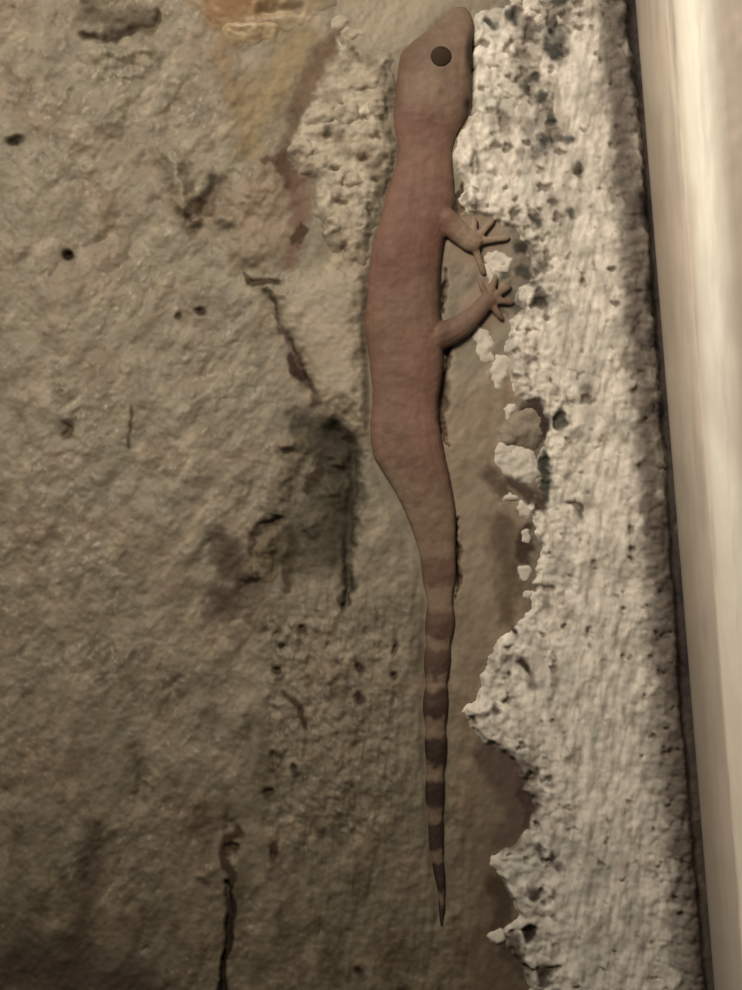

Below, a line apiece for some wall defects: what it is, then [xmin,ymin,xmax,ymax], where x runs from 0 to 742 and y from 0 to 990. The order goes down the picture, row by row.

flaking render [286,15,398,266]
crack [243,270,317,405]
damp [209,532,264,617]
spalling [247,420,359,610]
crack [217,827,243,990]